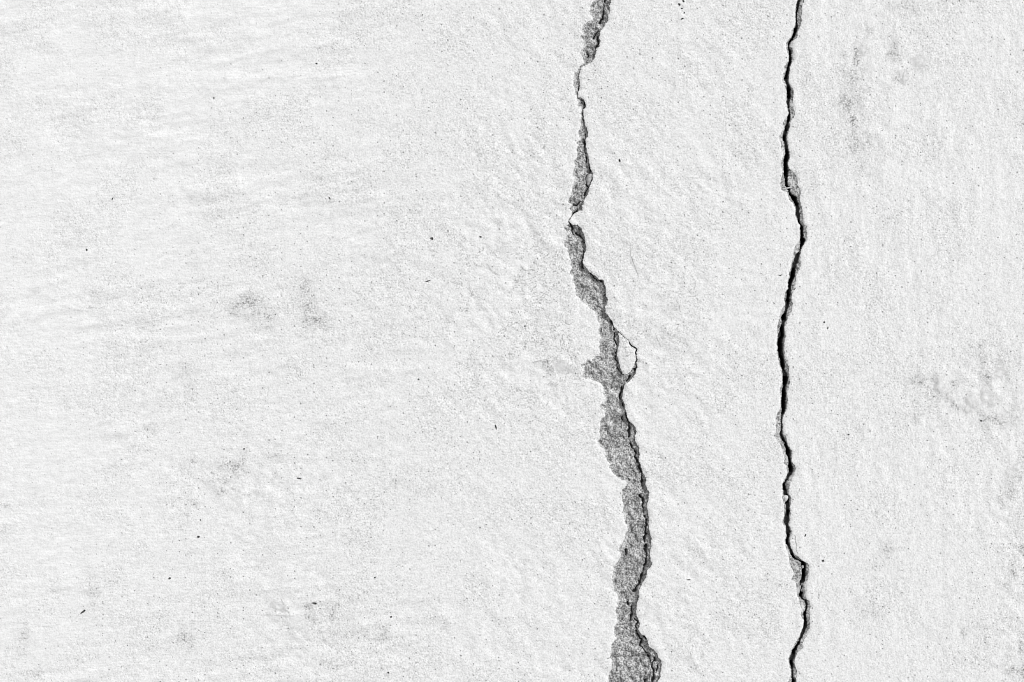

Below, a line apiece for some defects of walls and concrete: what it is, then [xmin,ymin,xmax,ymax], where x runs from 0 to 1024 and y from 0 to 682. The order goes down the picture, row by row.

crack [564,0,662,682]
crack [774,0,811,682]